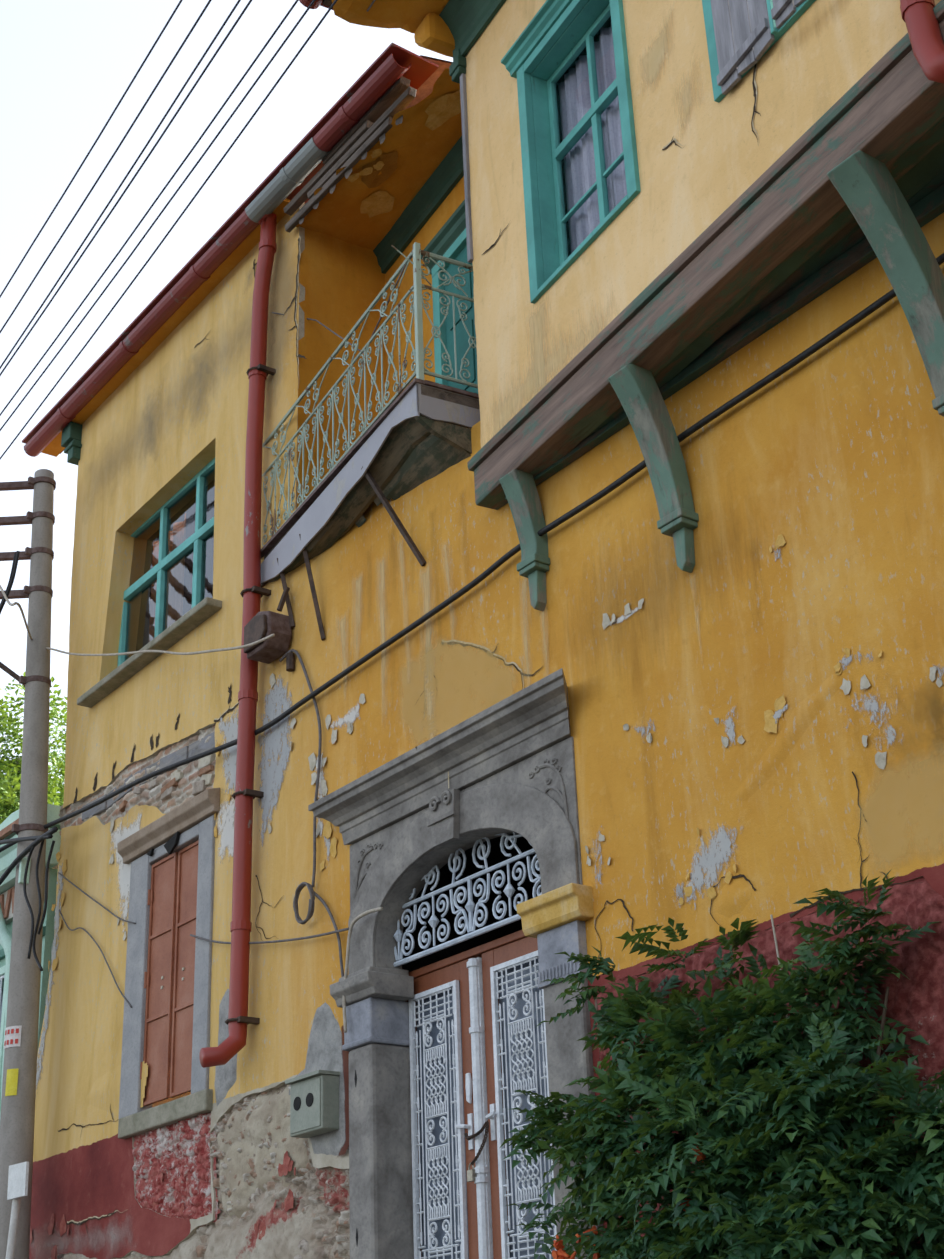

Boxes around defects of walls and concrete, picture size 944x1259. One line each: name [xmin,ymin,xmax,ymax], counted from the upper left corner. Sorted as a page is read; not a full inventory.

crack [751,63,761,141]
crack [283,236,306,388]
peeling [602,598,644,630]
spalling [59,708,239,940]
peeling [258,673,296,847]
crack [414,632,543,749]
peeling [674,826,741,909]
crack [789,771,923,918]
peeling [834,648,903,769]
peeling [36,852,67,1088]
spalling [597,877,944,1129]
spalling [114,1084,350,1259]